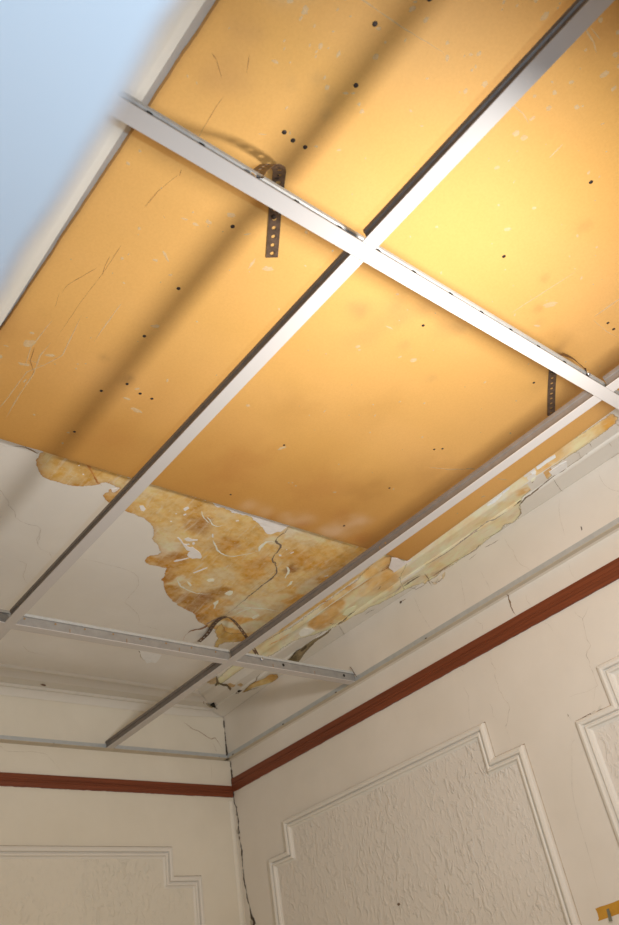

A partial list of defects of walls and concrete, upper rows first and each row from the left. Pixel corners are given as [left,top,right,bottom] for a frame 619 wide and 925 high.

peeling [28,447,132,503]
peeling [125,484,371,640]
peeling [389,557,412,572]
damp [249,414,618,656]
flaking render [288,629,331,662]
crack [184,719,255,925]